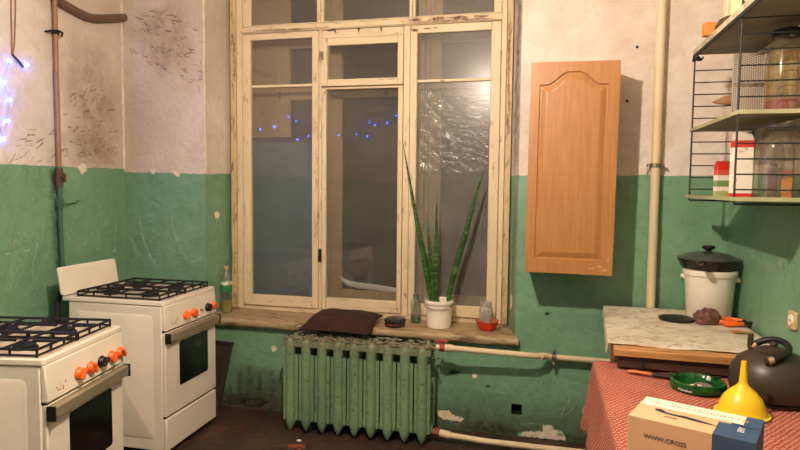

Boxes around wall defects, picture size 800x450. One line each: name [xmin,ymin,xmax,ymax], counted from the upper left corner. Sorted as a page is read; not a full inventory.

spalling [436,408,464,422]
spalling [517,422,567,441]